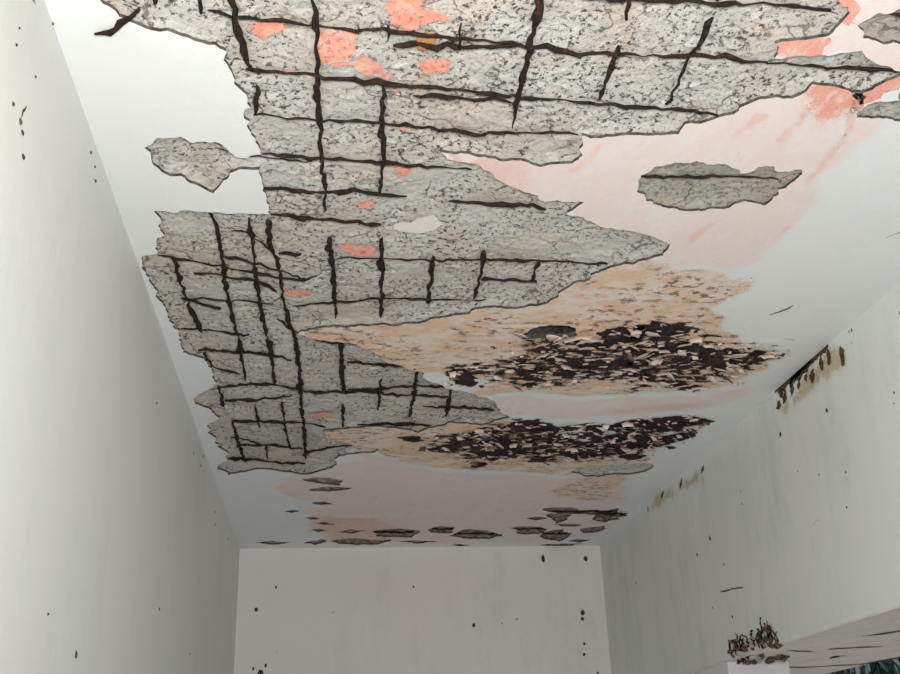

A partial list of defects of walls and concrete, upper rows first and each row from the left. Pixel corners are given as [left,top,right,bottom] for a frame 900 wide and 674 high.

spalling [94,0,900,491]
leakage [304,256,790,398]
leakage [323,413,715,501]
spalling [305,517,502,546]
spalling [512,507,627,562]
spalling [727,617,790,665]